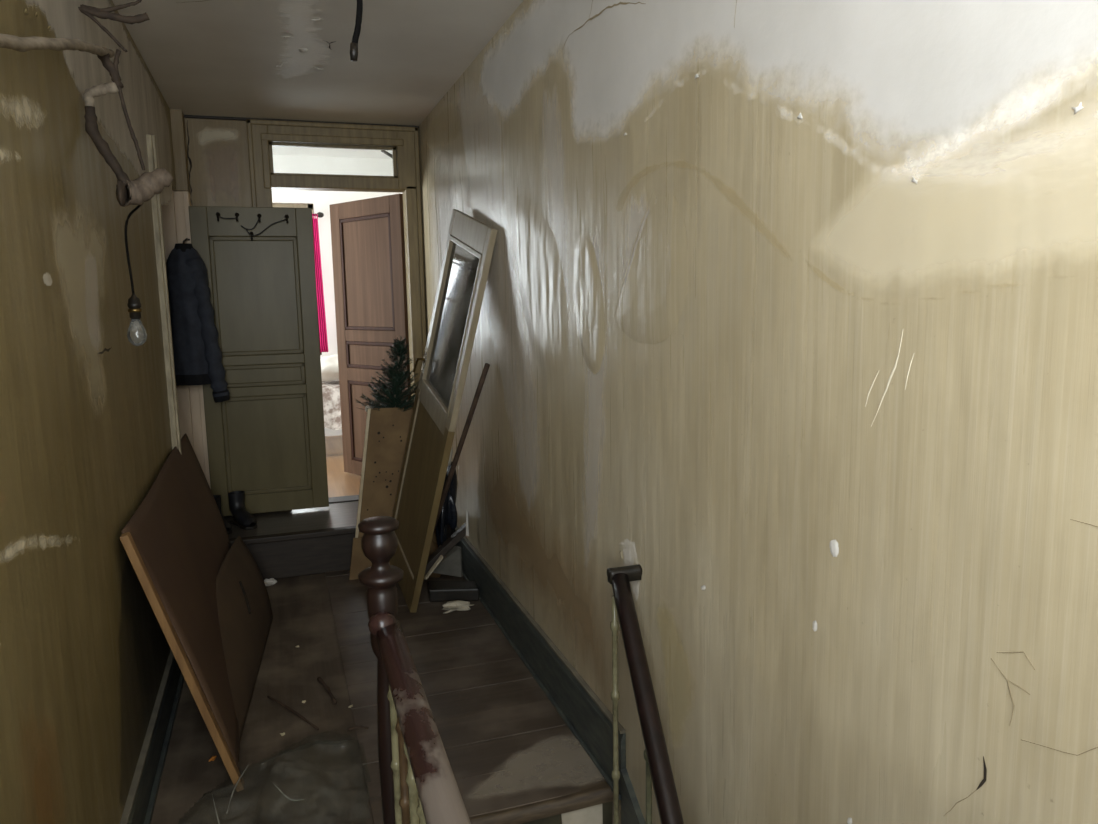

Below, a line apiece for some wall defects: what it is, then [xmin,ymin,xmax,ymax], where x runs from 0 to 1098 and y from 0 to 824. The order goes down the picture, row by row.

peeling [481,0,1098,138]